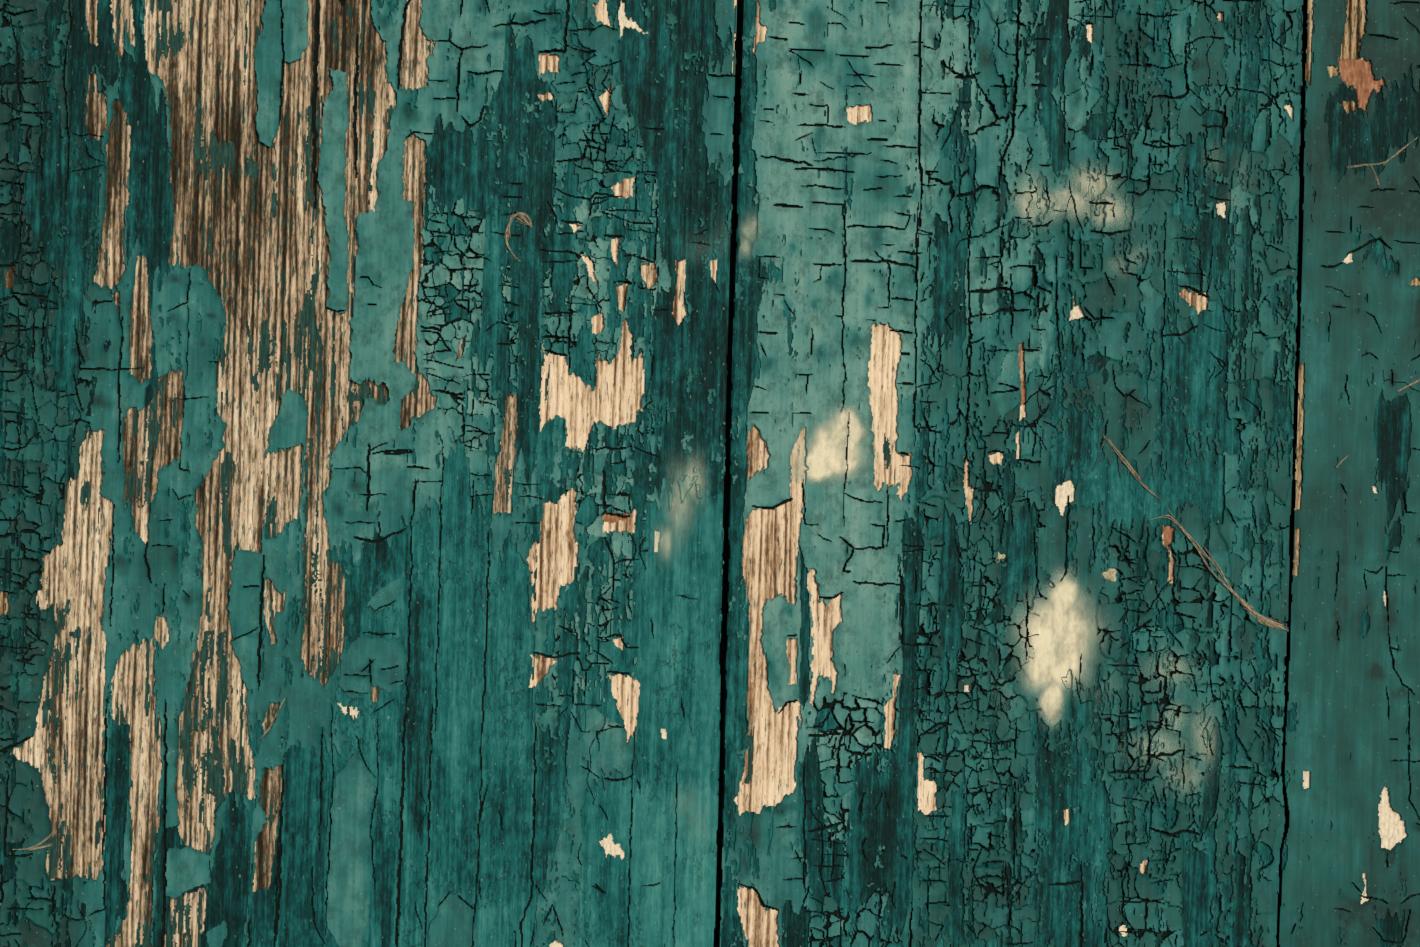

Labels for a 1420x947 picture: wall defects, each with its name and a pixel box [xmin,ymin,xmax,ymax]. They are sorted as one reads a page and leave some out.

crack [0,0,142,947]
crack [167,273,219,400]
peeling [11,0,843,947]
crack [247,0,720,947]
crack [707,74,735,98]
peeling [846,323,974,941]
crack [739,0,1420,947]
peeling [1034,723,1128,947]
peeling [1324,0,1420,180]
spalling [1378,787,1407,850]